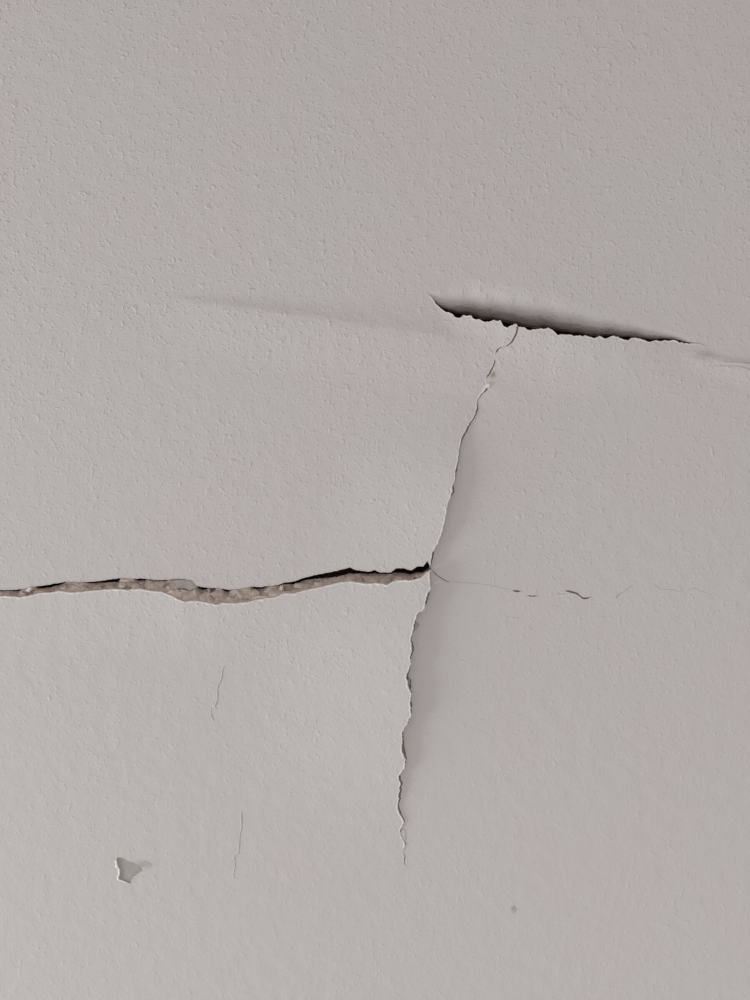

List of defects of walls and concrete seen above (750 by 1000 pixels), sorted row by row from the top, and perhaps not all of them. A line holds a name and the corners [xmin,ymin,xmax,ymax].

crack [0,277,750,867]
spalling [115,857,153,885]
crack [233,811,243,879]